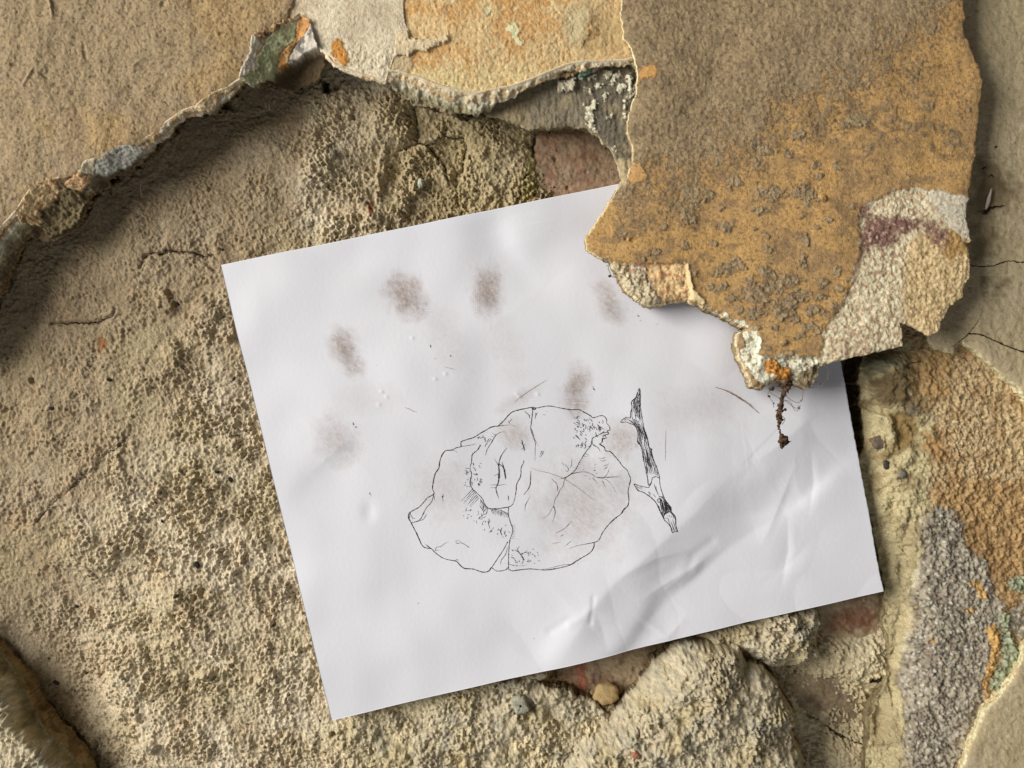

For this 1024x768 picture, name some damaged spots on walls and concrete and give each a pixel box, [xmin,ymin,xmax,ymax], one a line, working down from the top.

peeling [239,13,319,86]
peeling [390,30,449,73]
peeling [505,21,524,46]
peeling [19,92,218,238]
peeling [555,0,976,388]
crack [950,312,1024,353]
spalling [894,506,1024,768]